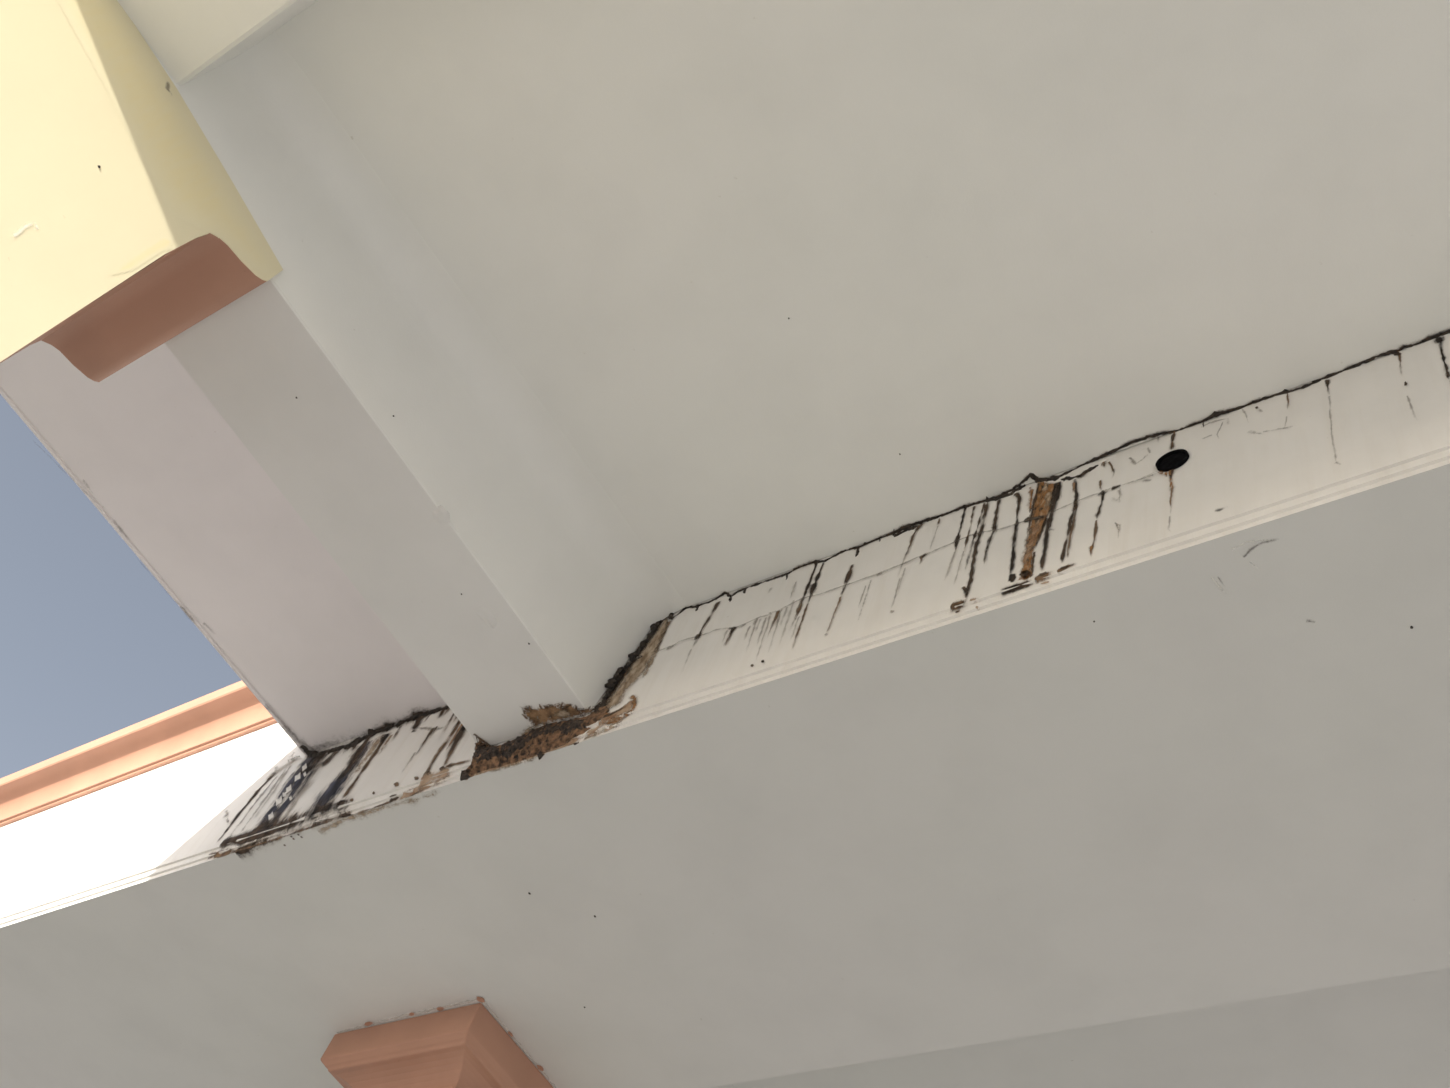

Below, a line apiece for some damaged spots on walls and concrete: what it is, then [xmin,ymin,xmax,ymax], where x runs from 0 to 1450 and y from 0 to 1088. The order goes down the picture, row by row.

crack [592,329,1450,712]
crack [300,705,449,759]
spalling [460,704,624,781]